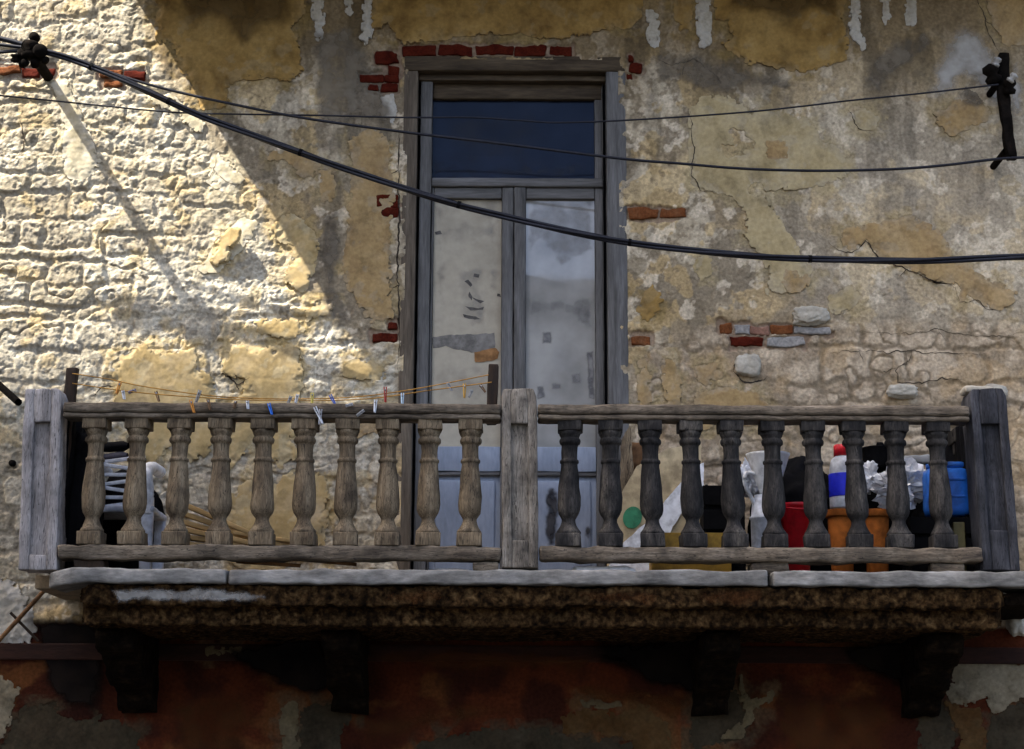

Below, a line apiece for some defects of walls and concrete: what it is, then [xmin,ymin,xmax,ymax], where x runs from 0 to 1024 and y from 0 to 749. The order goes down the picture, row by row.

peeling [150,0,306,133]
peeling [360,0,644,93]
peeling [713,0,850,73]
peeling [197,213,320,293]
peeling [342,129,399,343]
peeling [112,301,332,403]
crack [828,240,1019,384]
peeling [145,422,172,463]
peeling [187,422,212,463]
peeling [229,422,254,470]
peeling [269,423,297,539]
flaking render [916,664,1024,749]